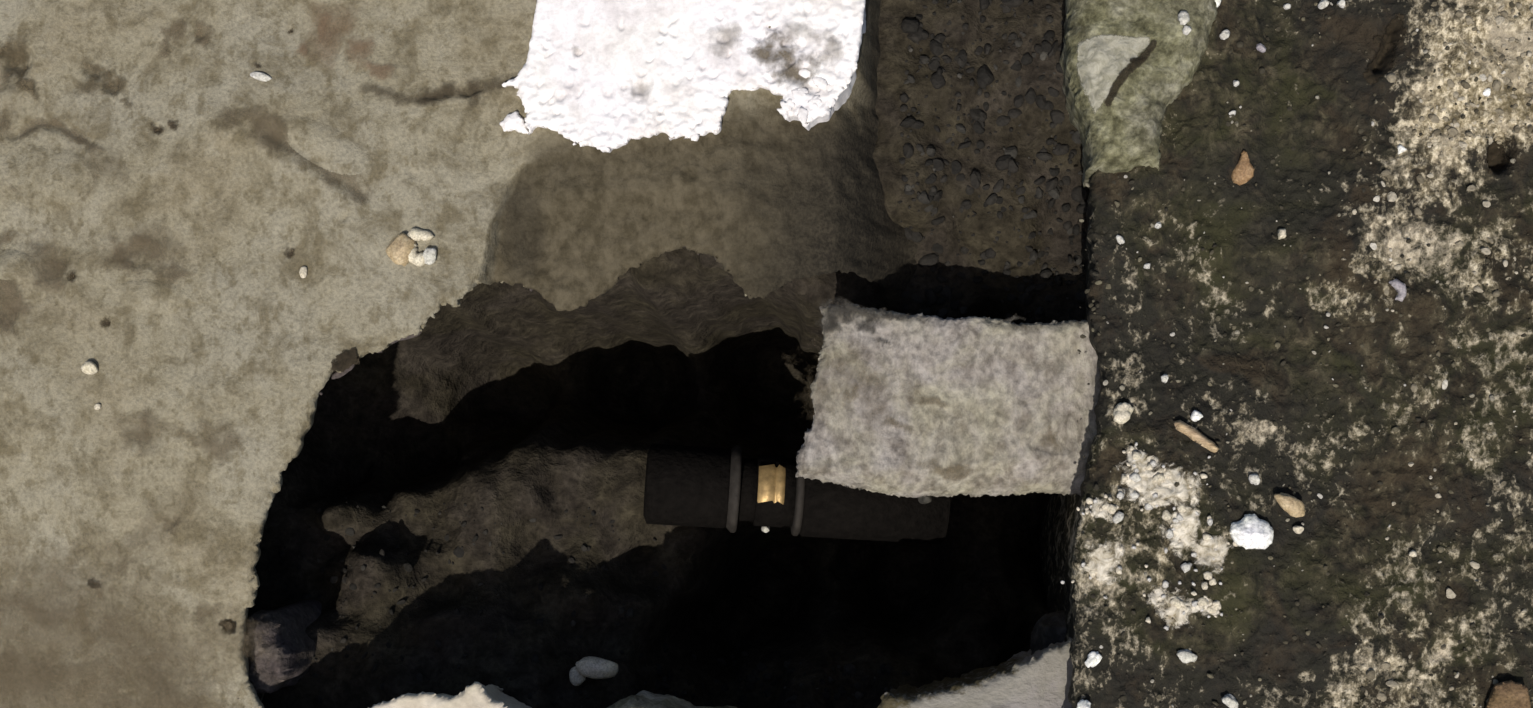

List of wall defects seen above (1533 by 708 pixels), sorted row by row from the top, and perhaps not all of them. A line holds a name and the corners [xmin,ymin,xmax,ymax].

flaking render [499,111,529,135]
spalling [319,324,426,395]
efflorescence [1061,542,1140,584]
efflorescence [1076,442,1238,630]